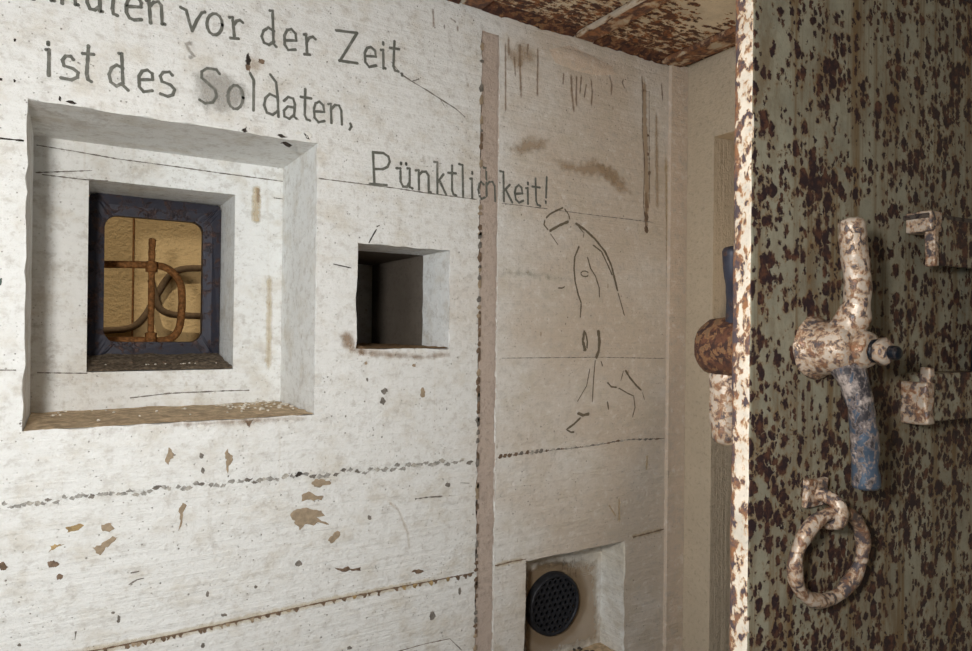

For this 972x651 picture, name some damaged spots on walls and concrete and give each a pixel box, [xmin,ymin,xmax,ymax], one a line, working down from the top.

corrosion [482,1,582,37]
corrosion [593,35,669,66]
water stain [505,39,538,109]
spalling [278,130,312,147]
peeling [2,201,482,651]